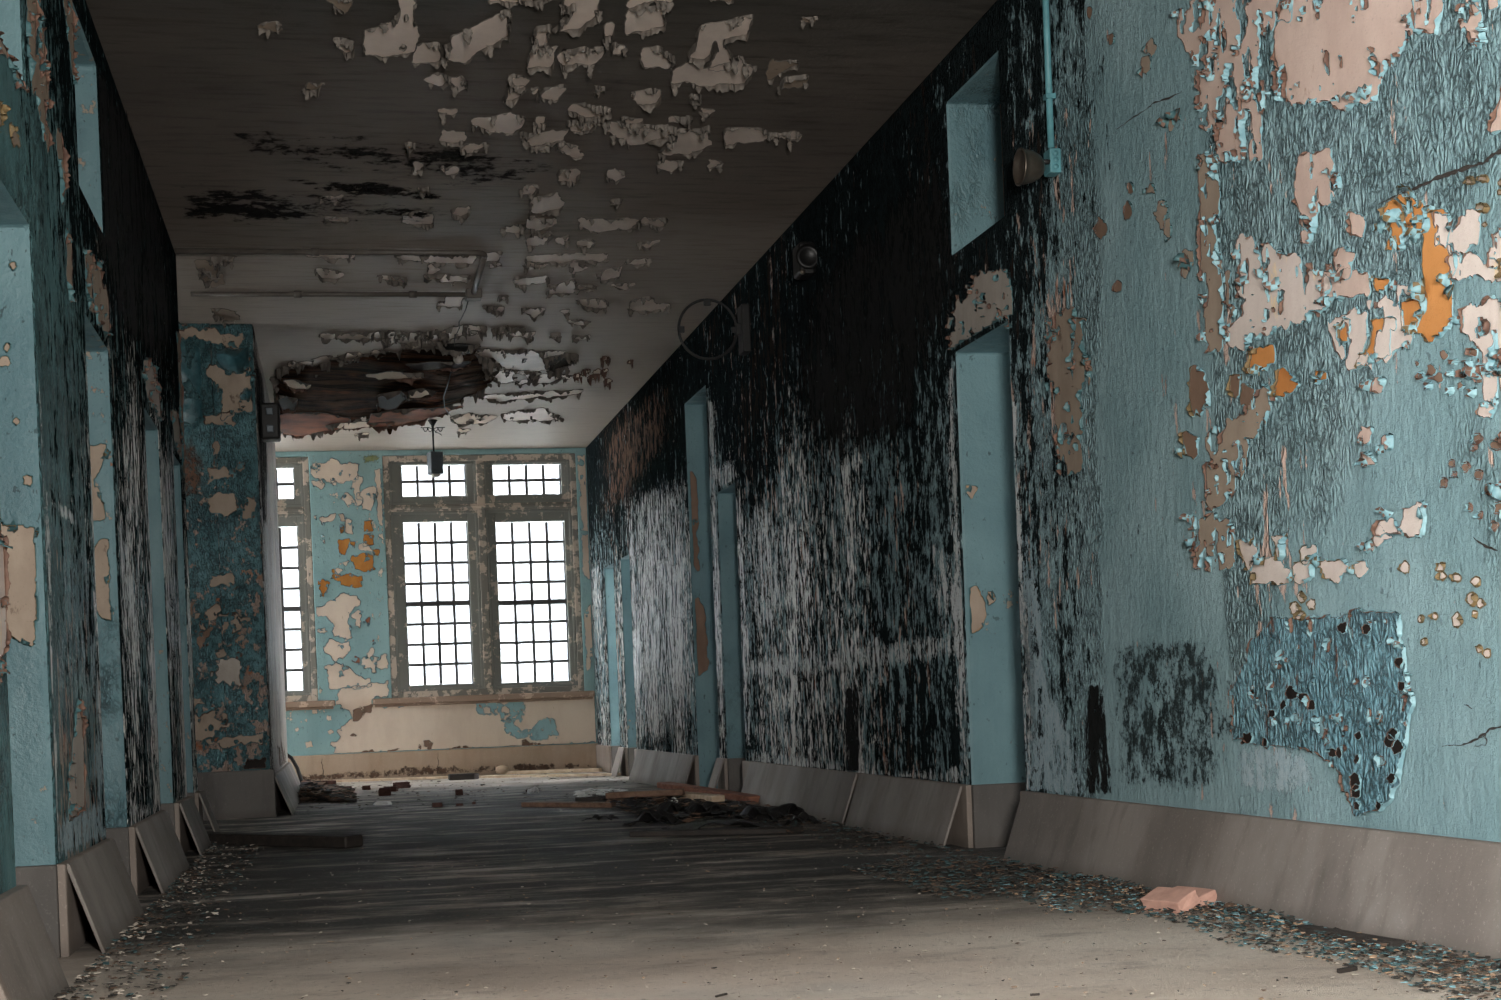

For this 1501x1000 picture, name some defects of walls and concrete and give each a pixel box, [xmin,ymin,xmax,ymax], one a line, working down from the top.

peeling [0,519,39,684]
leakage [42,432,106,859]
peeling [190,572,264,770]
peeling [295,455,597,754]
peeling [202,0,810,521]
leakage [599,384,694,741]
leakage [707,401,735,738]
leakage [737,368,969,782]
leakage [1154,684,1169,778]
peeling [1092,0,1501,817]
crack [1442,705,1501,747]